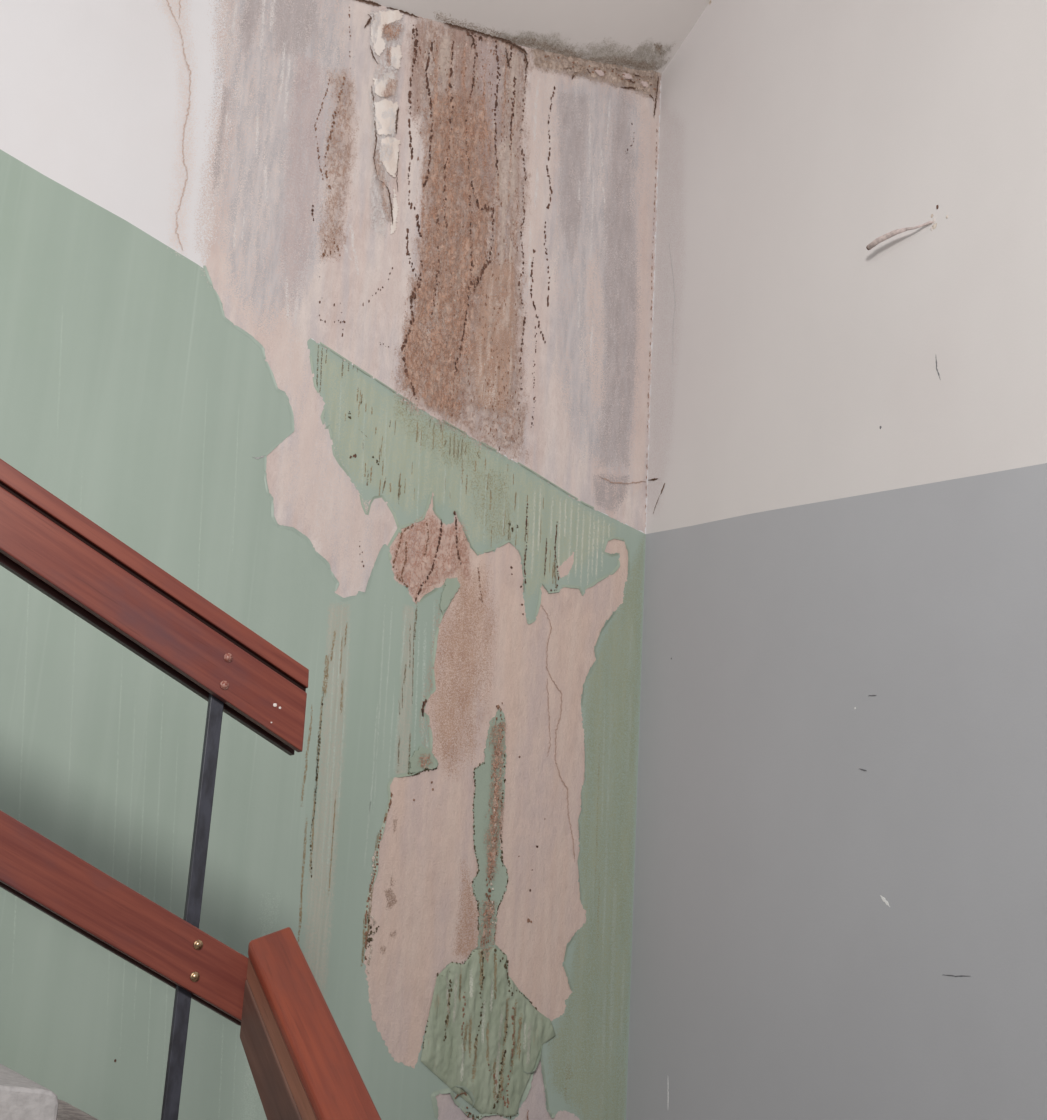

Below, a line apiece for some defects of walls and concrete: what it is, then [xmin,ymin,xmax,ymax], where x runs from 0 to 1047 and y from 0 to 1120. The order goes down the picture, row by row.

crack [156,0,200,256]
leakage [207,0,359,336]
leakage [313,12,673,606]
peeling [194,0,662,1068]
peeling [431,1046,580,1120]